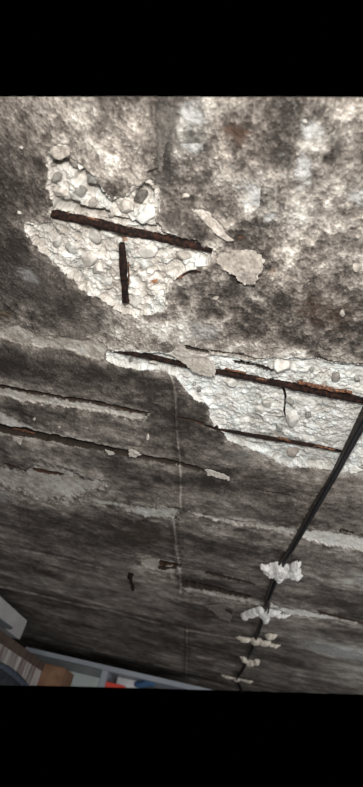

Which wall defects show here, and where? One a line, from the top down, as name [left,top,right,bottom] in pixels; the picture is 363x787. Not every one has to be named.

spalling [24,144,265,319]
crack [0,384,150,415]
spalling [0,323,363,474]
crack [0,463,84,479]
crack [0,423,206,472]